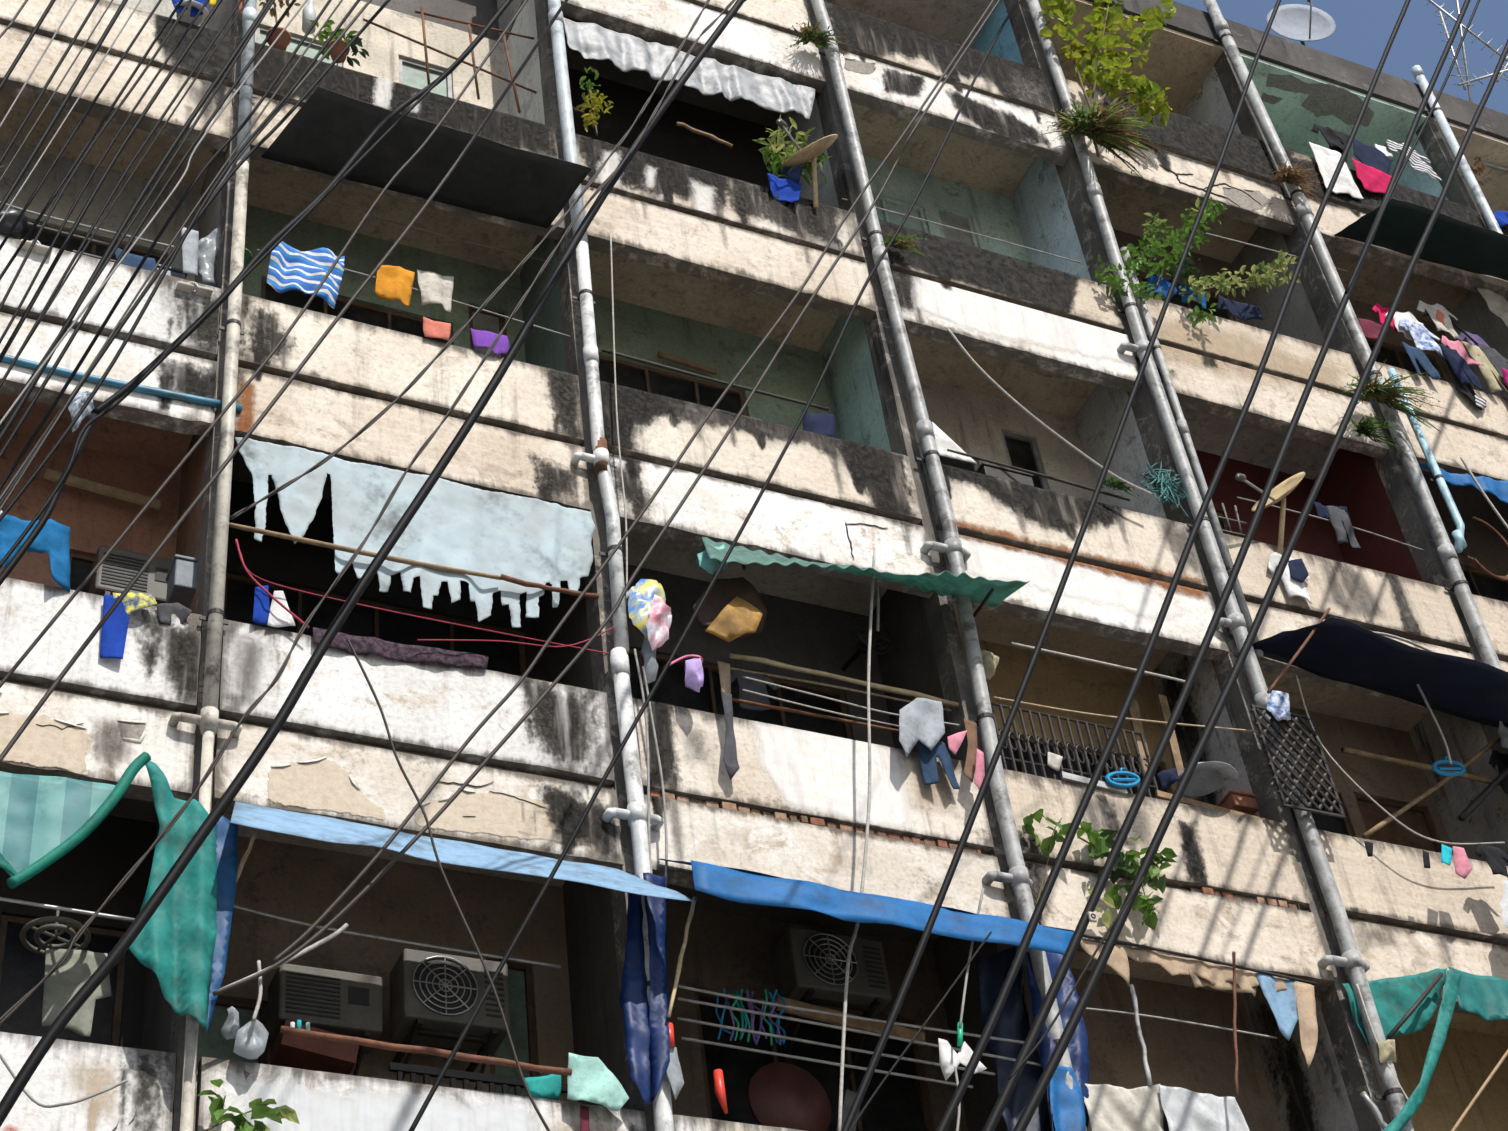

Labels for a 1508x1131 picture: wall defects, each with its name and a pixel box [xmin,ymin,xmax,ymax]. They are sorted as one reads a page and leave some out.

water stain [576,134,847,252]
water stain [159,294,219,409]
water stain [238,296,291,381]
water stain [138,609,199,696]
peeling [0,691,88,775]
peeling [118,719,146,744]
peeling [267,756,386,820]
water stain [522,677,617,857]
water stain [1163,657,1207,769]
water stain [1197,792,1217,805]
water stain [1179,820,1207,884]
water stain [88,1054,169,1131]